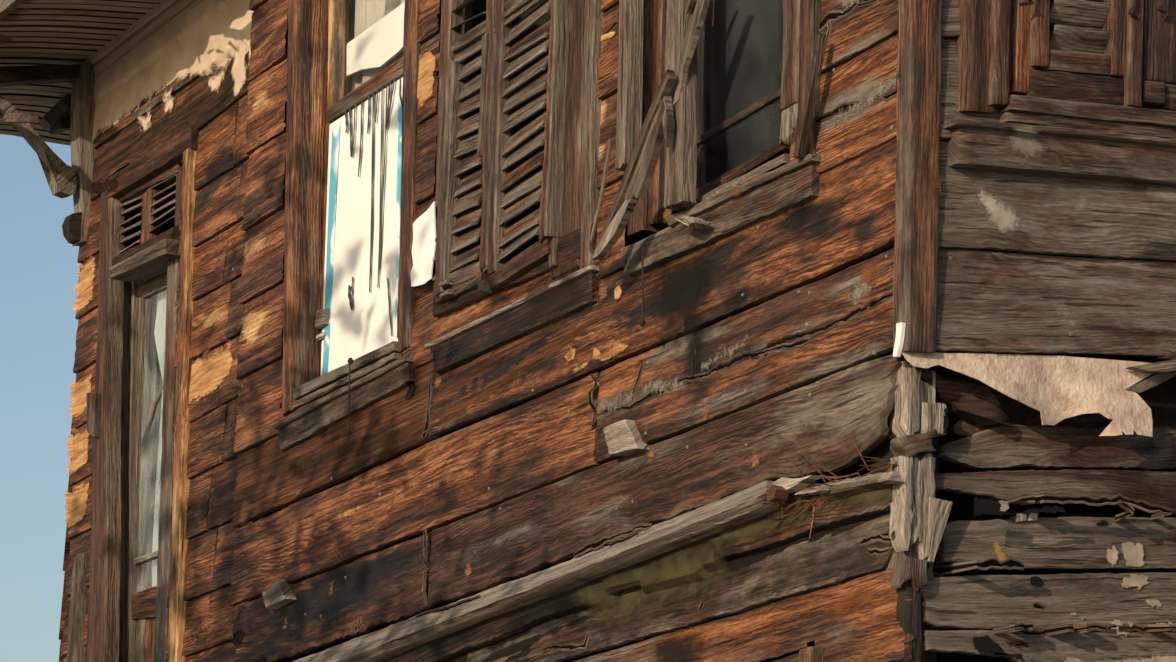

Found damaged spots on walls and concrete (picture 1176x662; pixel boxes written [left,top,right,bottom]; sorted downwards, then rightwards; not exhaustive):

crack [819,0,880,45]
peeling [92,0,260,142]
spalling [189,343,233,404]
crack [588,289,895,426]
peeling [893,322,1153,437]
spalling [64,373,92,528]
crack [1006,493,1172,522]
crack [860,522,895,556]
crack [927,541,1024,576]
peeling [1106,541,1162,608]
crack [993,601,1176,648]
peeling [1116,654,1176,662]